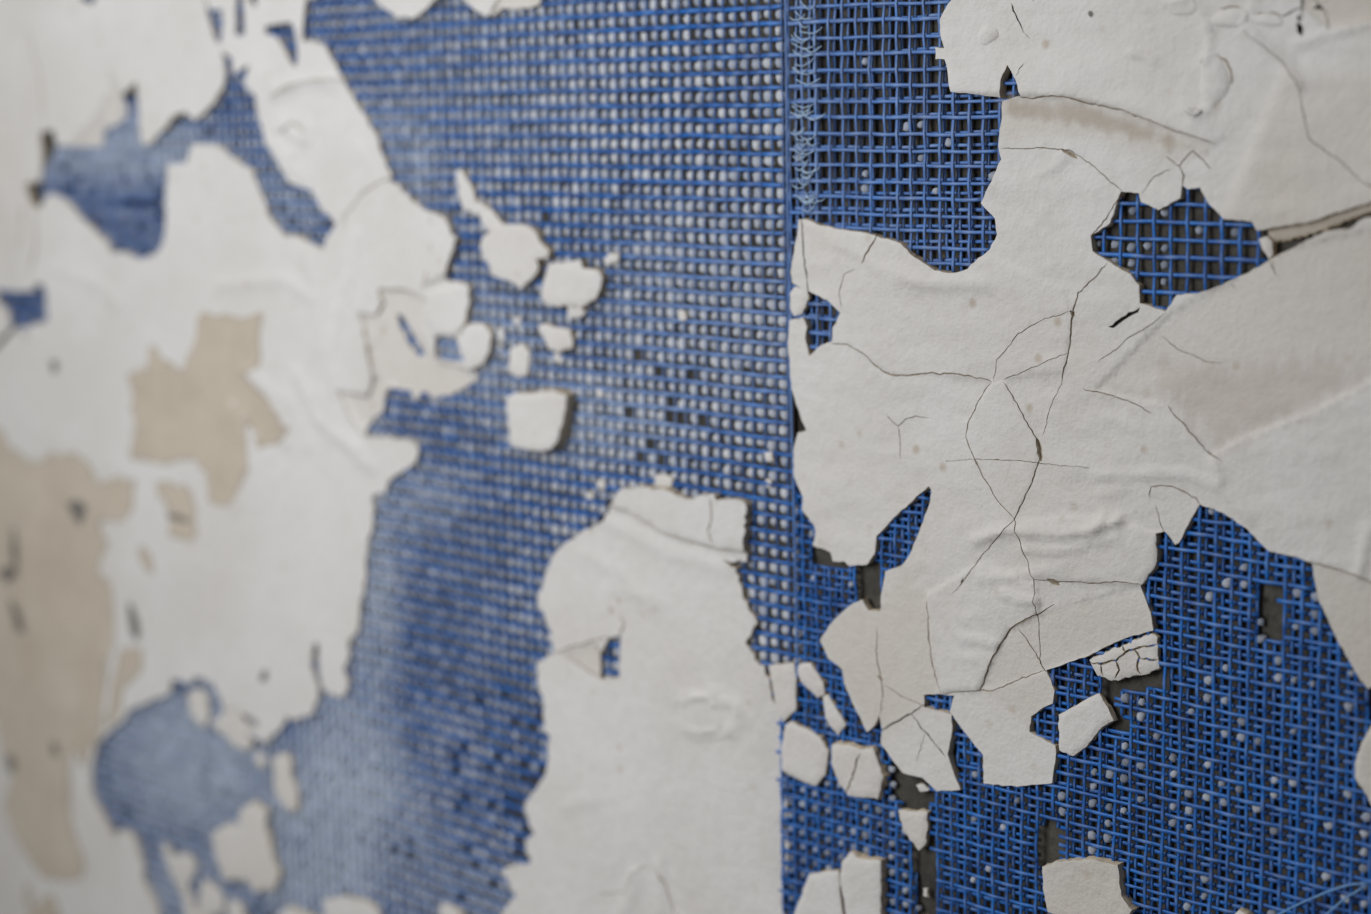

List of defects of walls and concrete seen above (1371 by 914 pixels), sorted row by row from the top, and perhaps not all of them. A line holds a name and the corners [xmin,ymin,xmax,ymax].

peeling [0,284,47,328]
peeling [0,431,142,882]
peeling [31,0,336,258]
peeling [94,0,1020,914]
crack [801,217,878,303]
crack [832,65,1219,755]
peeling [769,481,1371,914]
peeling [1093,187,1371,310]
crack [1312,563,1371,583]